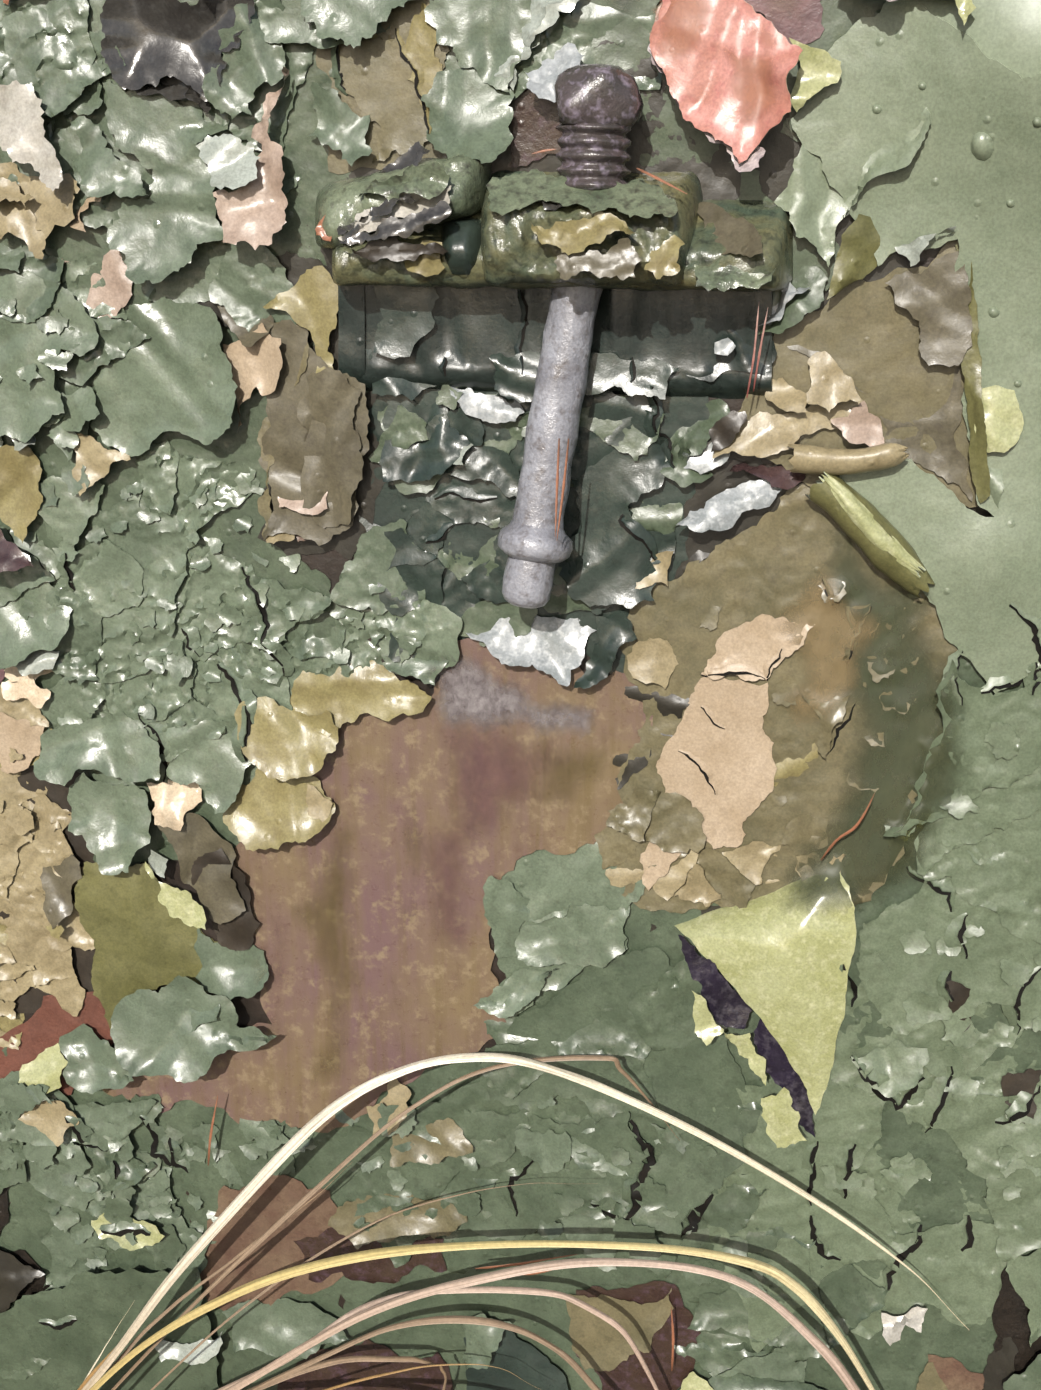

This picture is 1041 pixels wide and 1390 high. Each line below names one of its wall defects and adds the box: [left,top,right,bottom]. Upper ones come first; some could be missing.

corrosion [665,0,706,53]
corrosion [736,57,770,119]
peeling [315,214,332,241]
peeling [486,169,678,281]
peeling [365,285,440,361]
peeling [543,0,1041,684]
crack [941,602,1041,705]
peeling [0,350,1041,1390]
crack [906,866,968,1003]
crack [839,964,858,1007]
crack [850,1053,954,1133]
crack [995,1085,1041,1125]